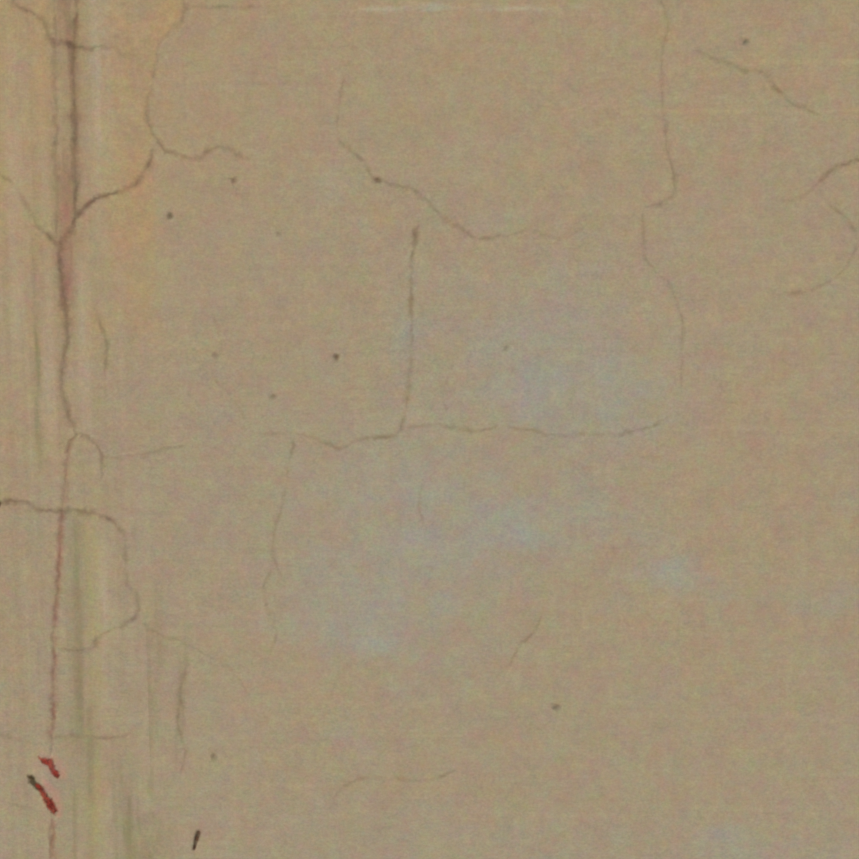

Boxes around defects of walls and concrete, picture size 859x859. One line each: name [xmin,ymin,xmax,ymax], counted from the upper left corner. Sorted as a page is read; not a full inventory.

crack [0,0,255,777]
crack [44,814,61,859]